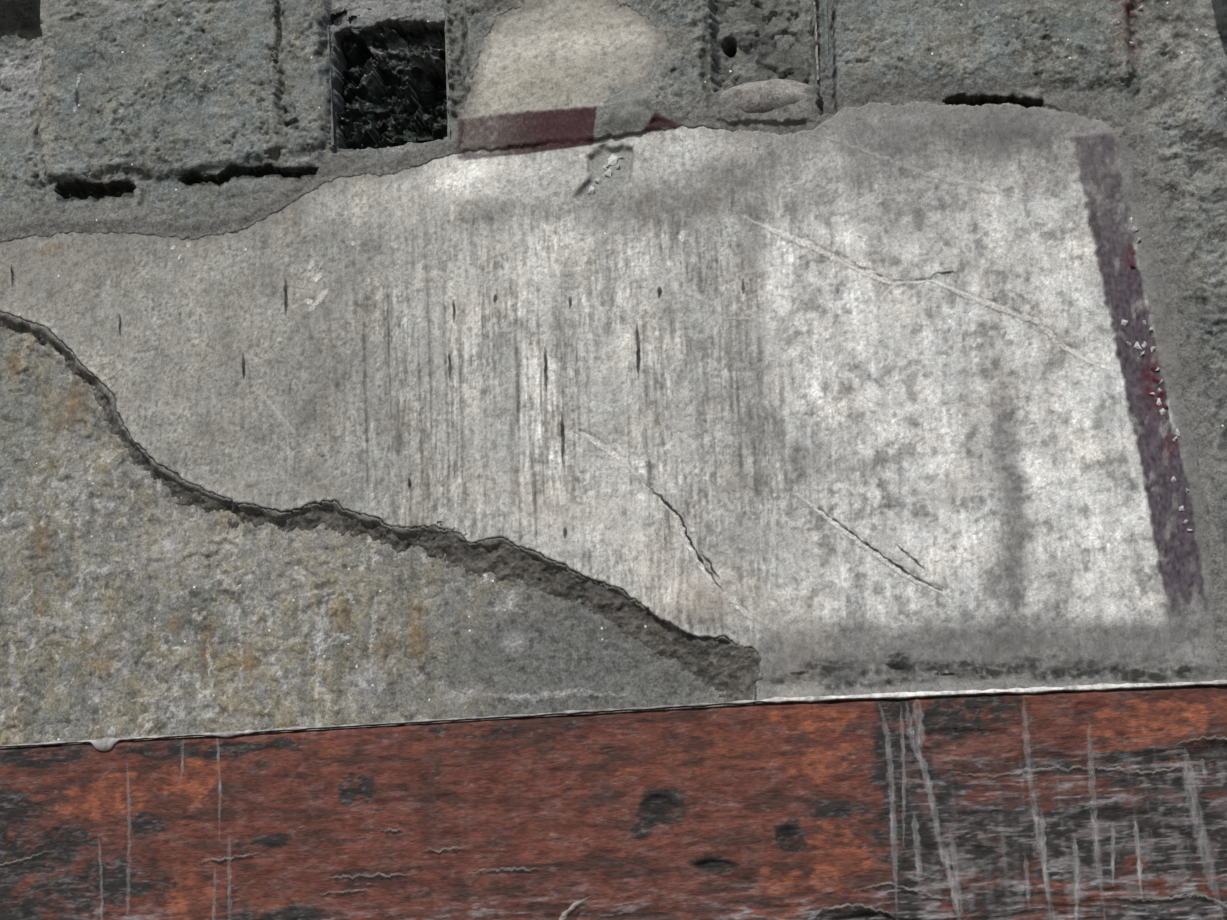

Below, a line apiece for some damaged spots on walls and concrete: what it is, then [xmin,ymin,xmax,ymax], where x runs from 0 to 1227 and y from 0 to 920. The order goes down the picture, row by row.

spalling [575,147,633,203]
crack [763,226,1085,360]
spalling [0,311,764,748]
crack [577,431,748,617]
crack [810,505,935,588]